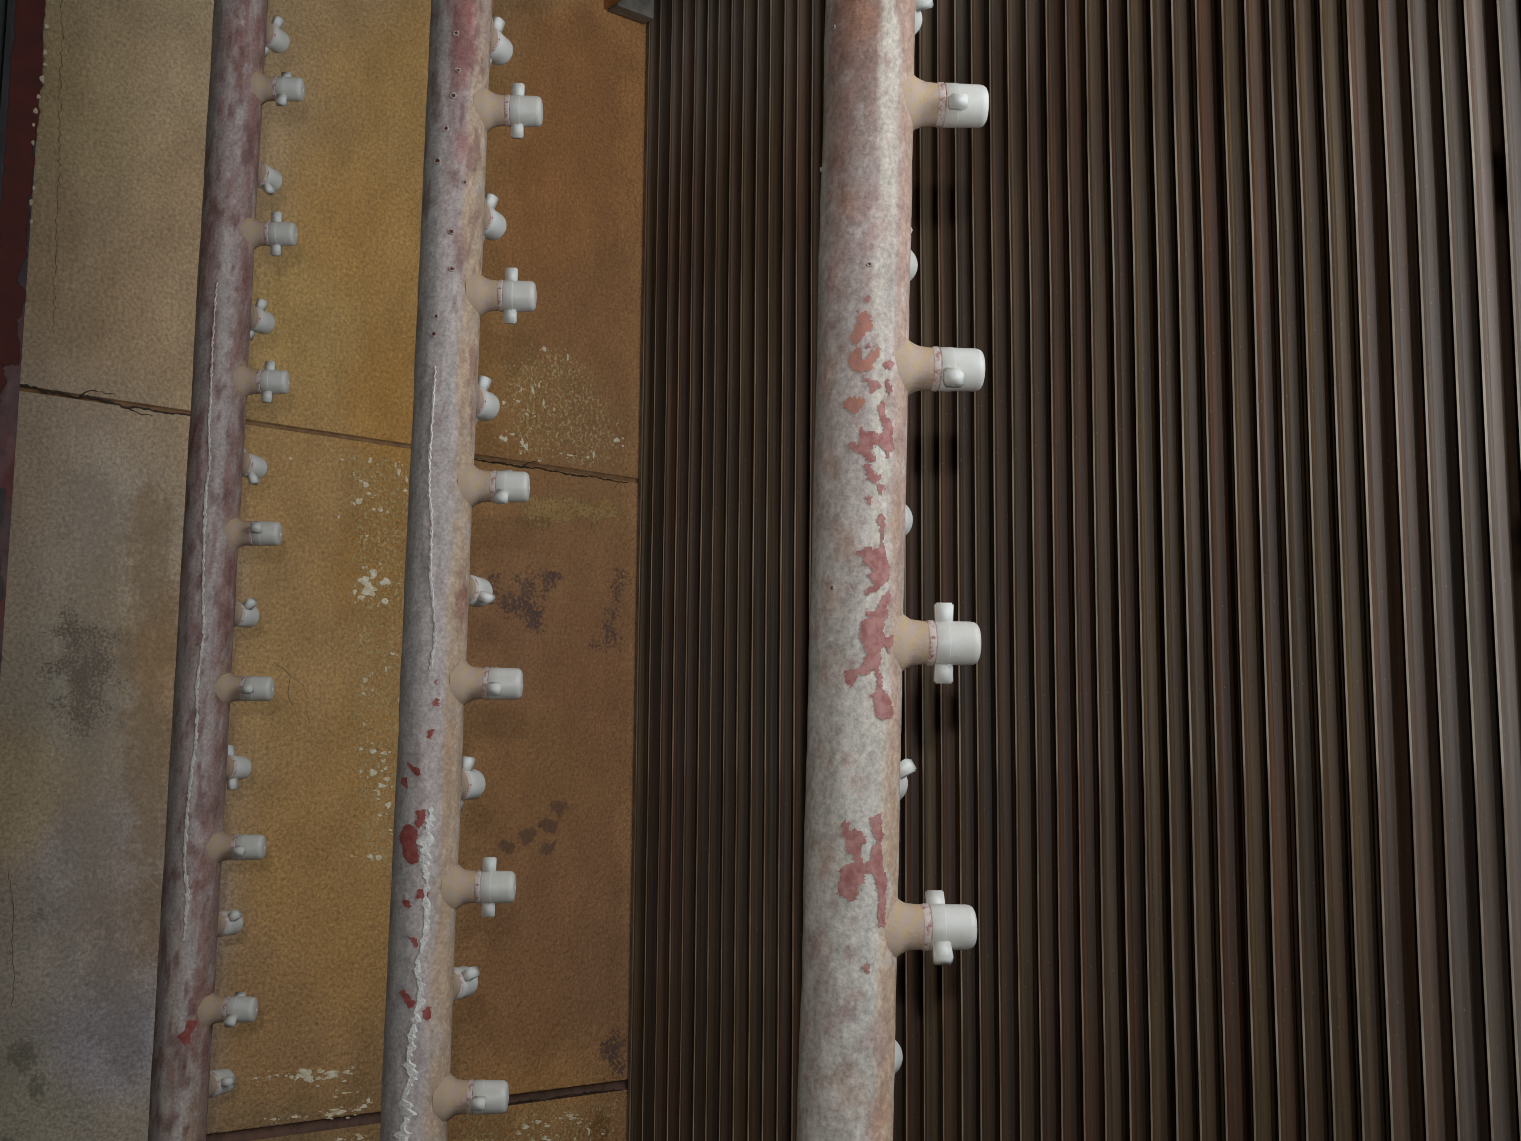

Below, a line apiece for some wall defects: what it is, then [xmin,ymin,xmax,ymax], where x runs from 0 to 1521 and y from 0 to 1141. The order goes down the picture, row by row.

damp [488,567,561,634]
damp [46,607,129,735]